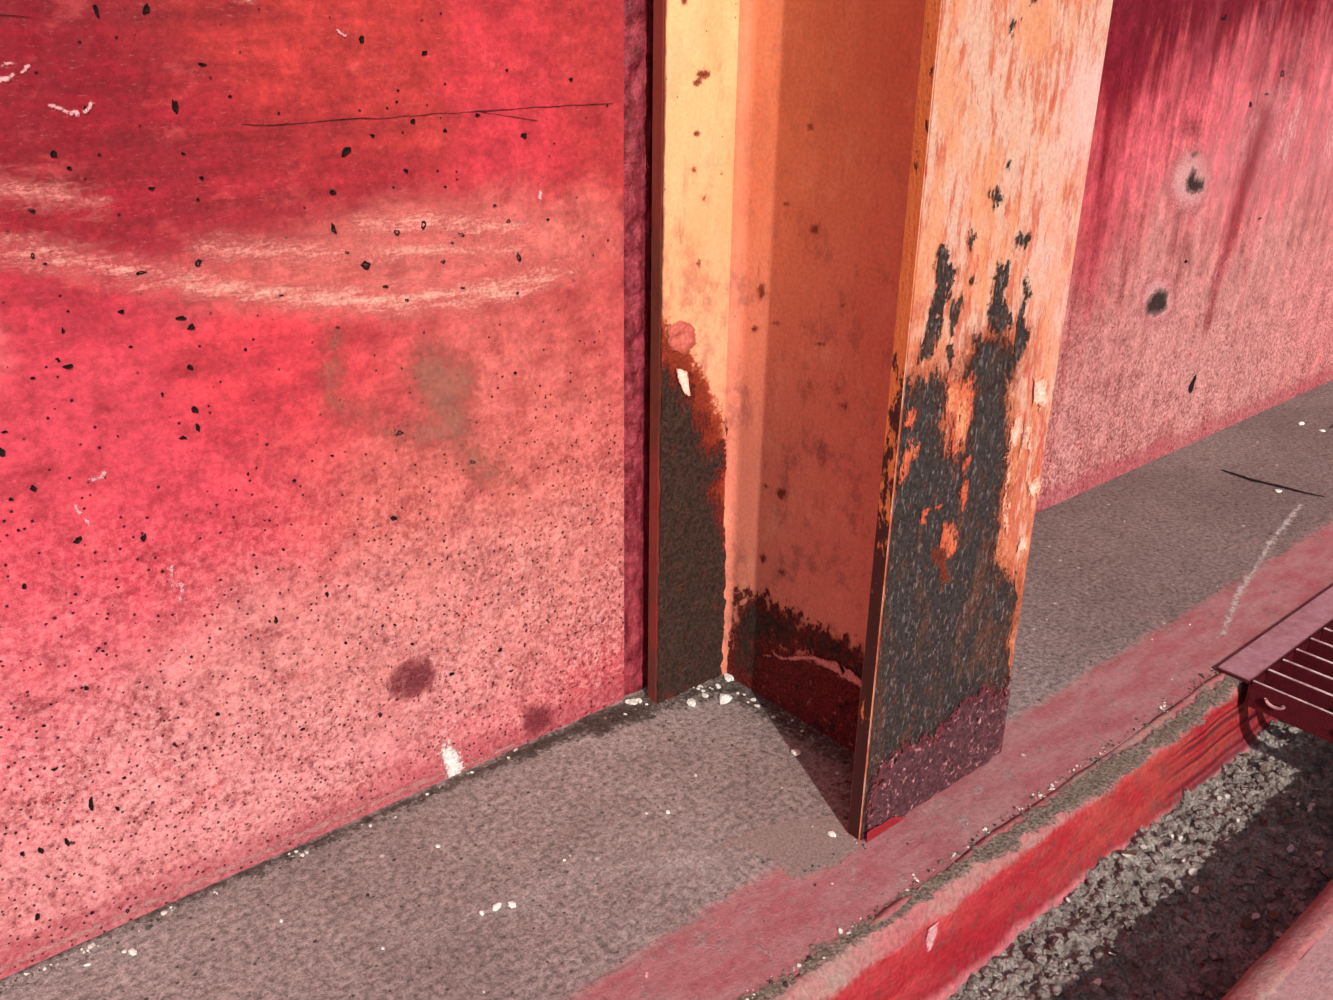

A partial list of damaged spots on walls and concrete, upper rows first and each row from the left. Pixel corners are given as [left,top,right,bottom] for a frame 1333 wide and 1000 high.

crack [242,103,613,126]
water stain [1214,0,1333,193]
rust [657,317,1029,840]